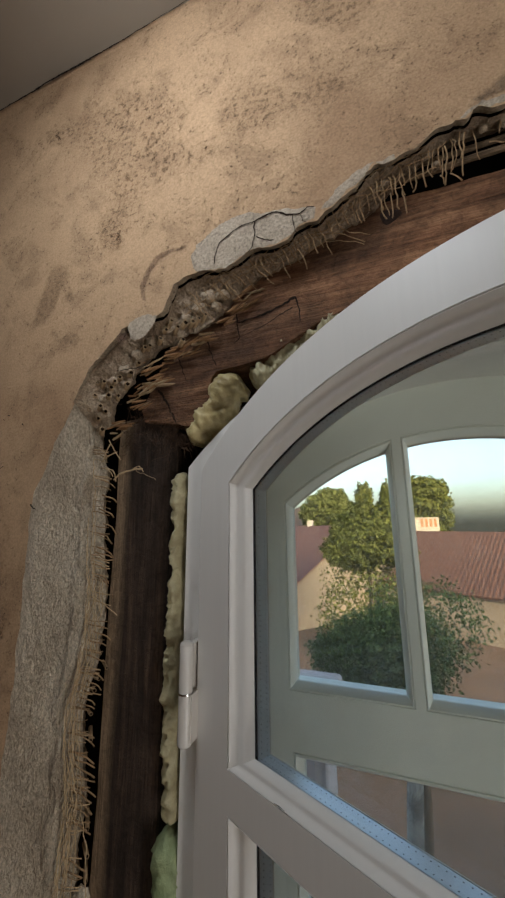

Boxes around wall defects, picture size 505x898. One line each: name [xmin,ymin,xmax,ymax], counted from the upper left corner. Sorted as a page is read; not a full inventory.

crack [0,1,185,111]
spalling [460,94,505,119]
crack [214,206,314,263]
crack [234,296,301,343]
spalling [75,110,505,432]
spalling [0,404,110,898]